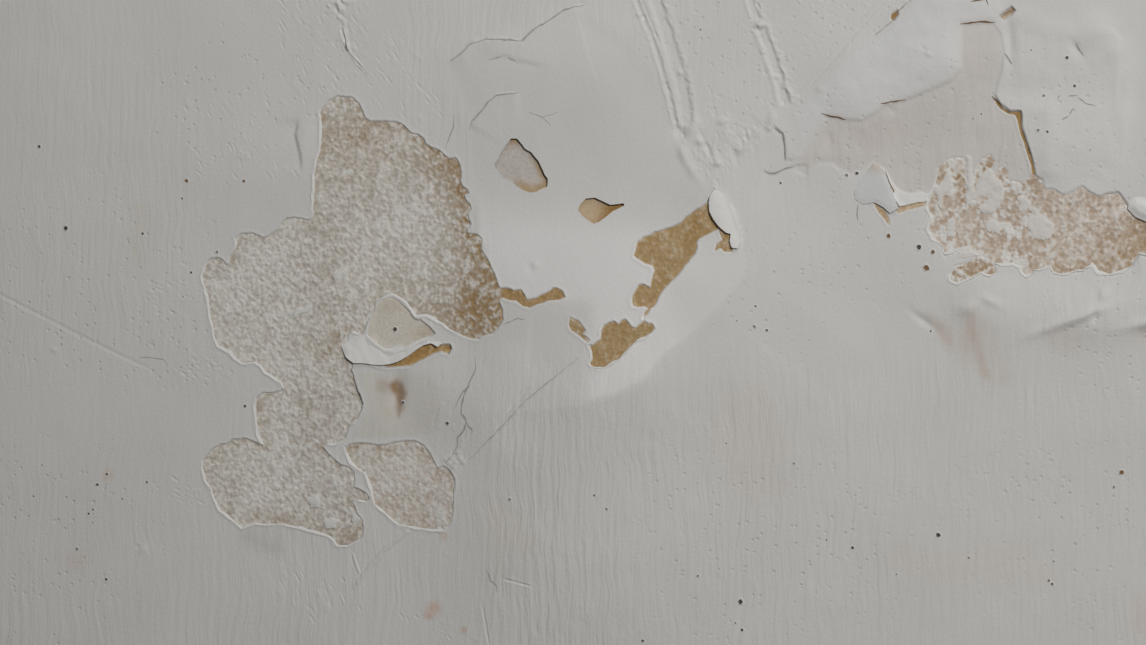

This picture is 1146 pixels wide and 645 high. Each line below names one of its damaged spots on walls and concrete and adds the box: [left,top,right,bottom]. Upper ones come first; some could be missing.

crack [450,5,583,61]
crack [446,92,557,146]
spalling [797,5,1146,286]
peeling [709,189,741,252]
spalling [199,96,565,548]
peeling [569,318,589,342]